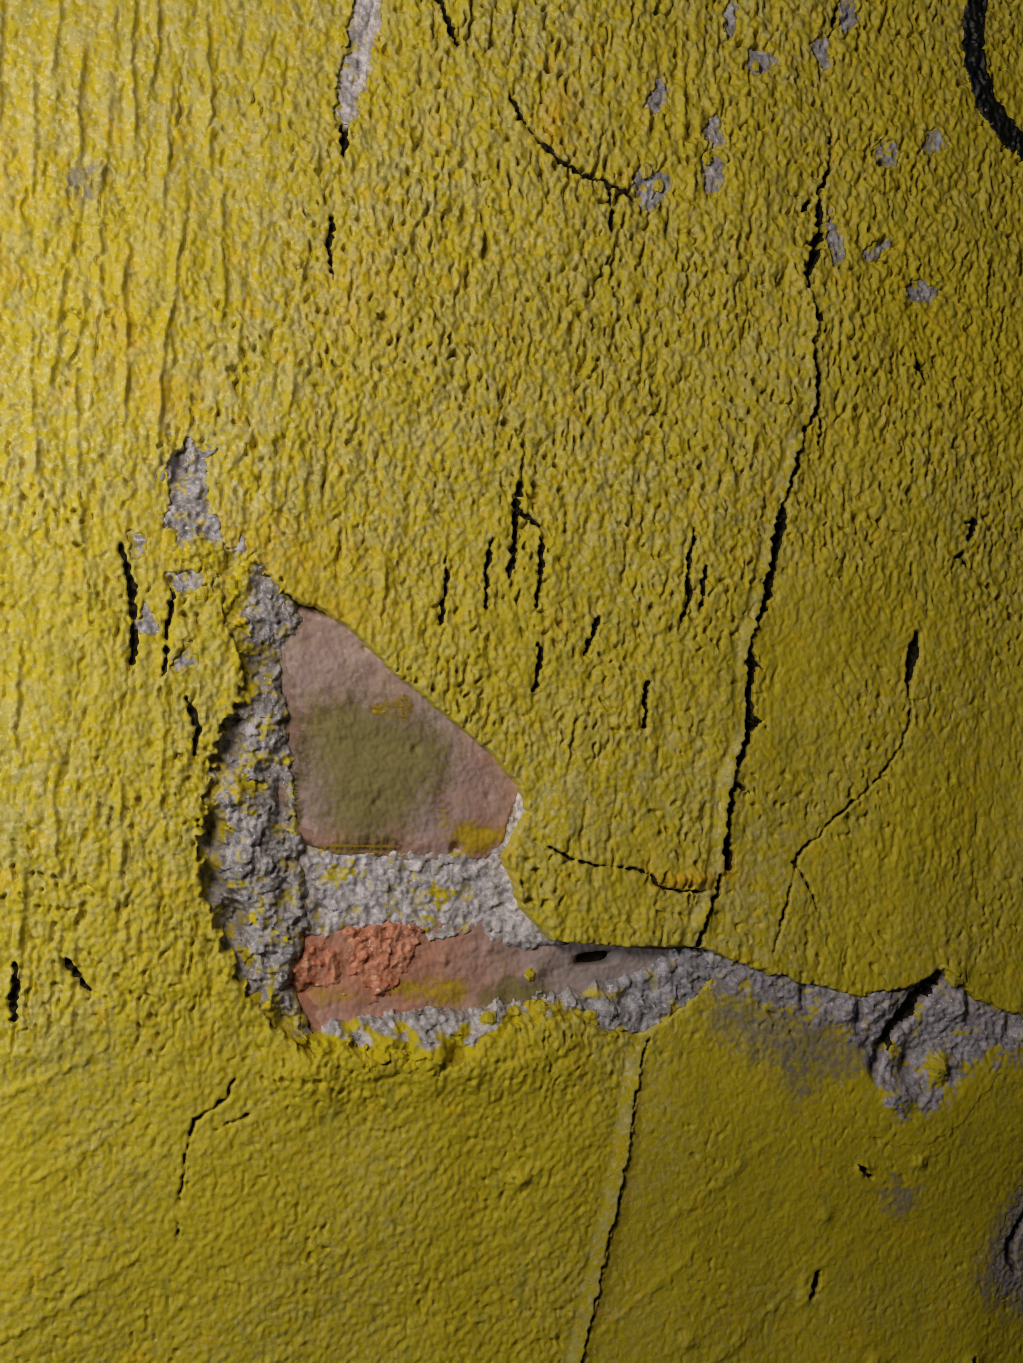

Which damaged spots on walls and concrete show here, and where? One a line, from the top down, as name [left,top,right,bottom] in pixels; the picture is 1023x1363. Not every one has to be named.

peeling [723,0,739,39]
peeling [809,0,860,70]
peeling [333,0,383,157]
peeling [643,78,670,116]
crack [509,94,633,233]
peeling [626,163,673,213]
peeling [700,114,727,199]
peeling [899,279,938,305]
crack [548,137,831,949]
peeling [132,602,160,635]
flaking render [153,430,1023,1148]
crack [775,631,919,940]